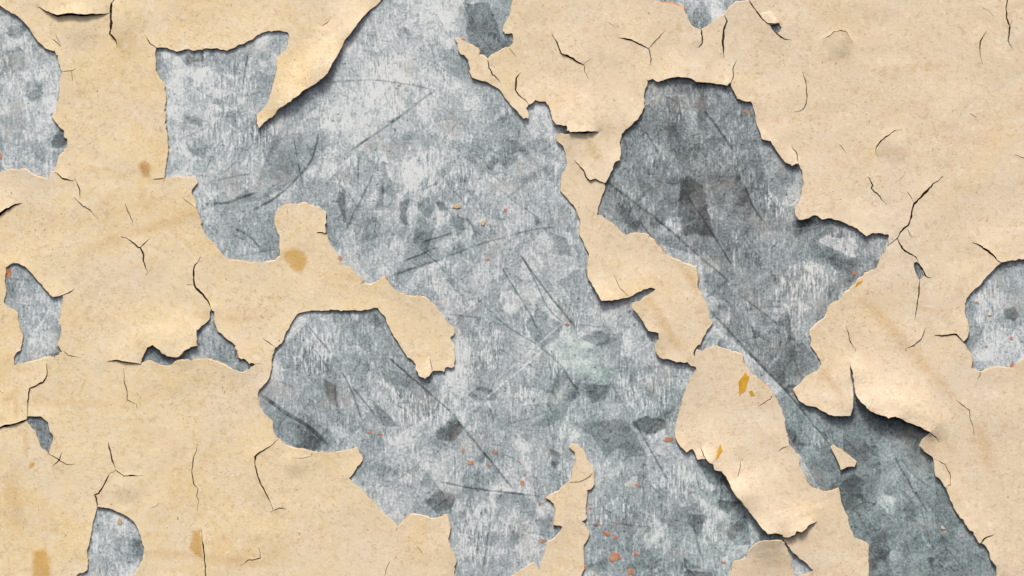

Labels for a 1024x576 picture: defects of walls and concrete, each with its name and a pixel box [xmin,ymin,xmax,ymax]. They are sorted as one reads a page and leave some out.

peeling [0,6,80,194]
crack [609,22,663,65]
peeling [0,263,77,465]
crack [120,204,149,275]
peeling [107,258,256,384]
peeling [147,0,819,576]
peeling [575,58,996,576]
peeling [935,242,1024,378]
peeling [77,443,146,576]